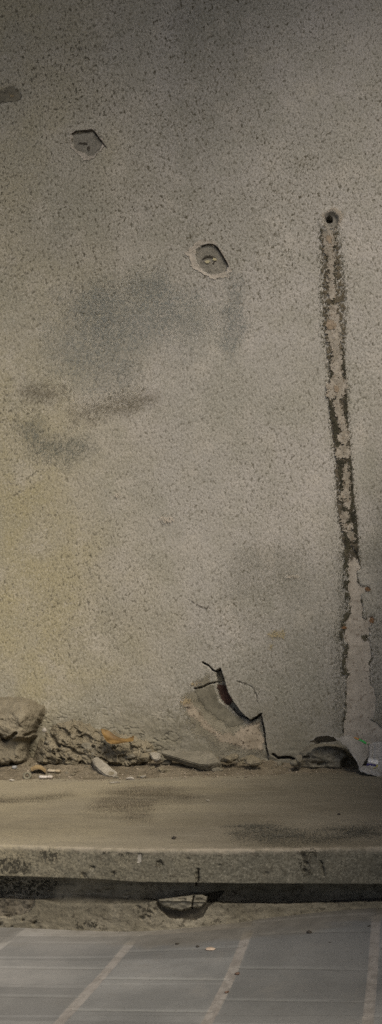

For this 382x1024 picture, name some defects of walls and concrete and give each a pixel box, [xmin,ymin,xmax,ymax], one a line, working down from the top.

spalling [69,129,108,161]
spalling [185,239,232,280]
spalling [177,664,267,757]